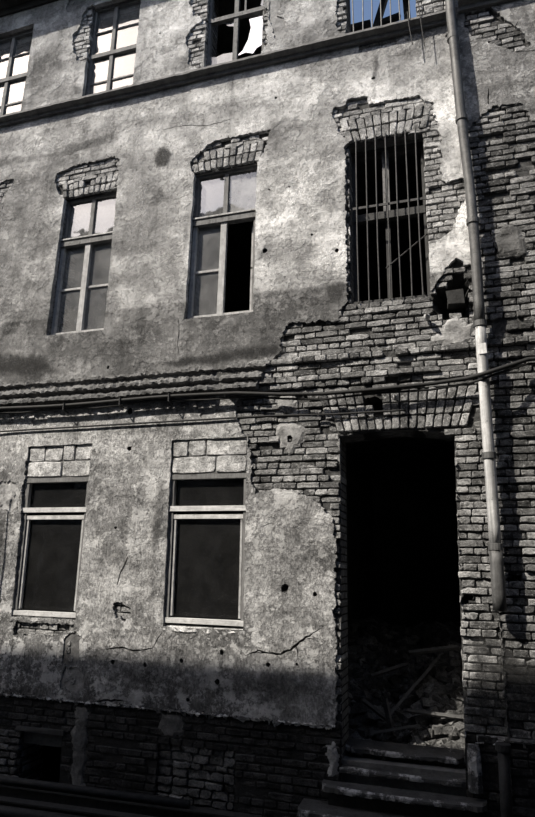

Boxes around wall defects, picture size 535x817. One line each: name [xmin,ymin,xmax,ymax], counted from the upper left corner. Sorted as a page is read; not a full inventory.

flaking render [66,0,102,75]
flaking render [186,0,219,68]
flaking render [336,0,351,34]
flaking render [416,0,446,17]
flaking render [464,9,531,52]
flaking render [191,132,269,176]
flaking render [0,180,14,212]
flaking render [56,158,120,200]
flaking render [234,98,535,750]
crack [107,645,152,653]
crack [247,629,320,655]